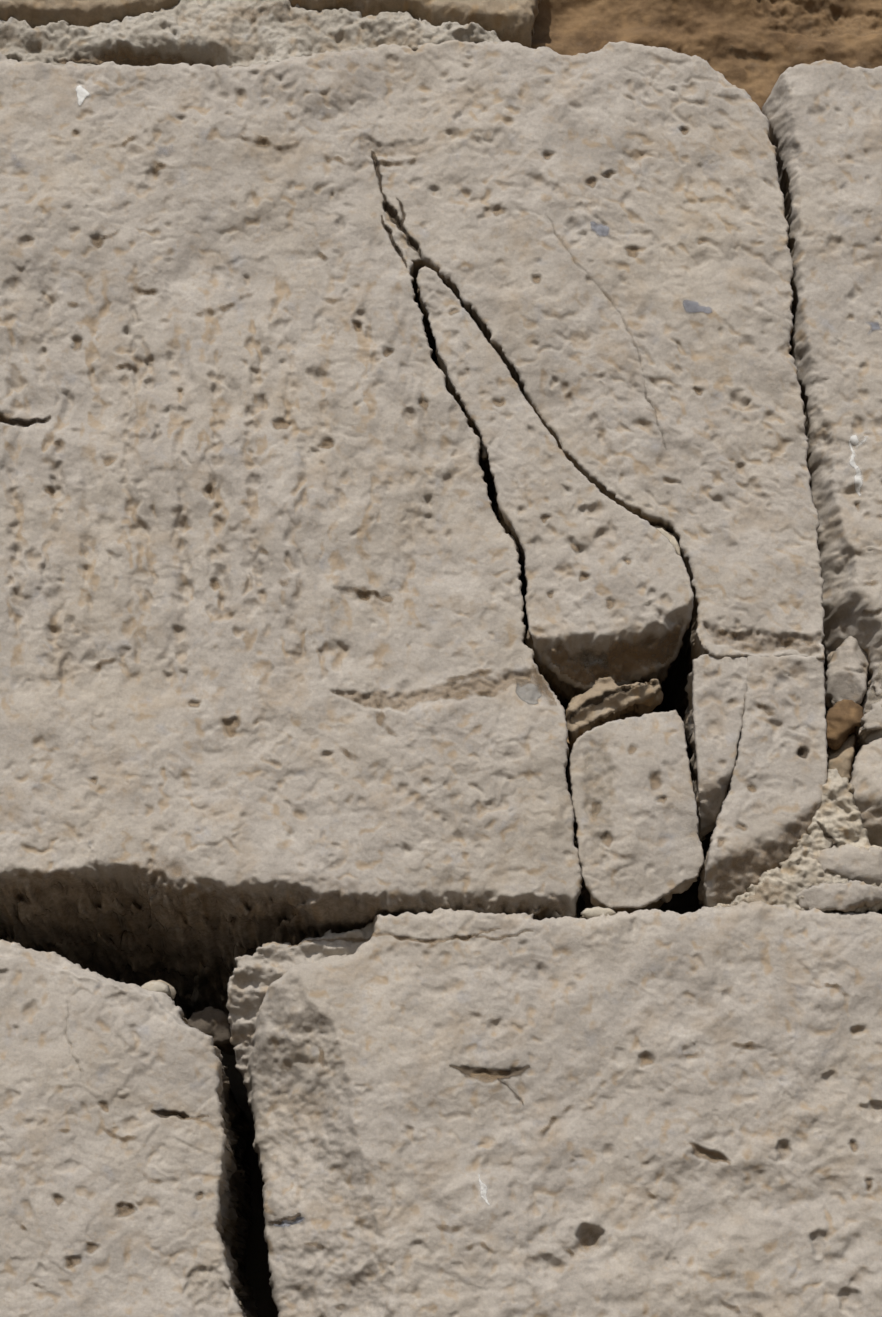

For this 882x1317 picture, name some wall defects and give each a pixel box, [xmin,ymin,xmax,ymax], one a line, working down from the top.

crack [371,151,422,267]
spalling [825,636,882,783]